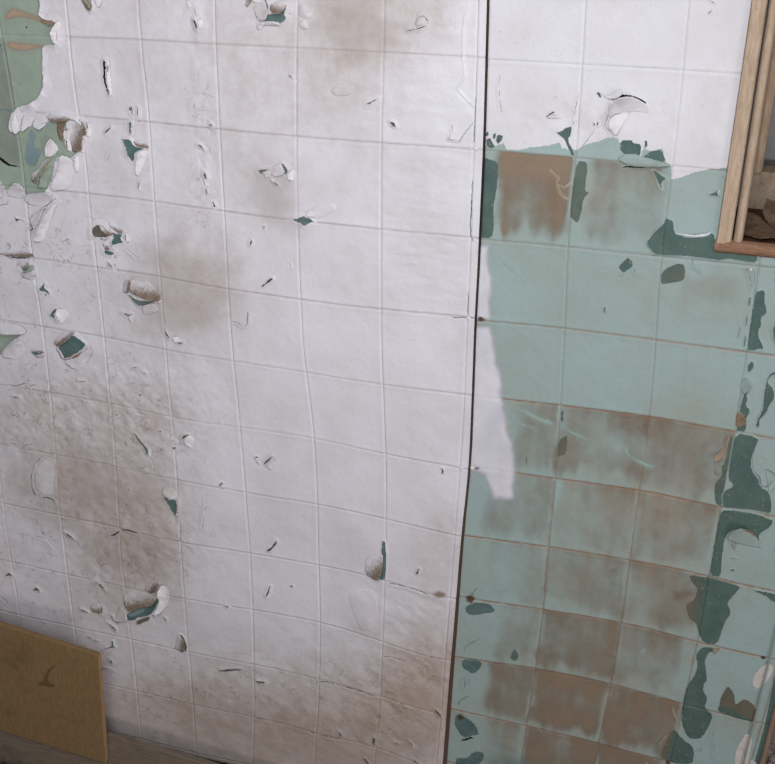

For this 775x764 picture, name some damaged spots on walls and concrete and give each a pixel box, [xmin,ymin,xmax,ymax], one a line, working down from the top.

peeling [245,0,294,30]
peeling [0,0,92,243]
peeling [86,219,130,272]
peeling [481,158,499,238]
water stain [499,152,573,234]
peeling [557,127,588,223]
peeling [591,89,670,192]
peeling [0,249,92,382]
peeling [365,539,389,582]
peeling [661,288,775,764]
peeling [78,580,169,652]
water stain [489,622,679,764]